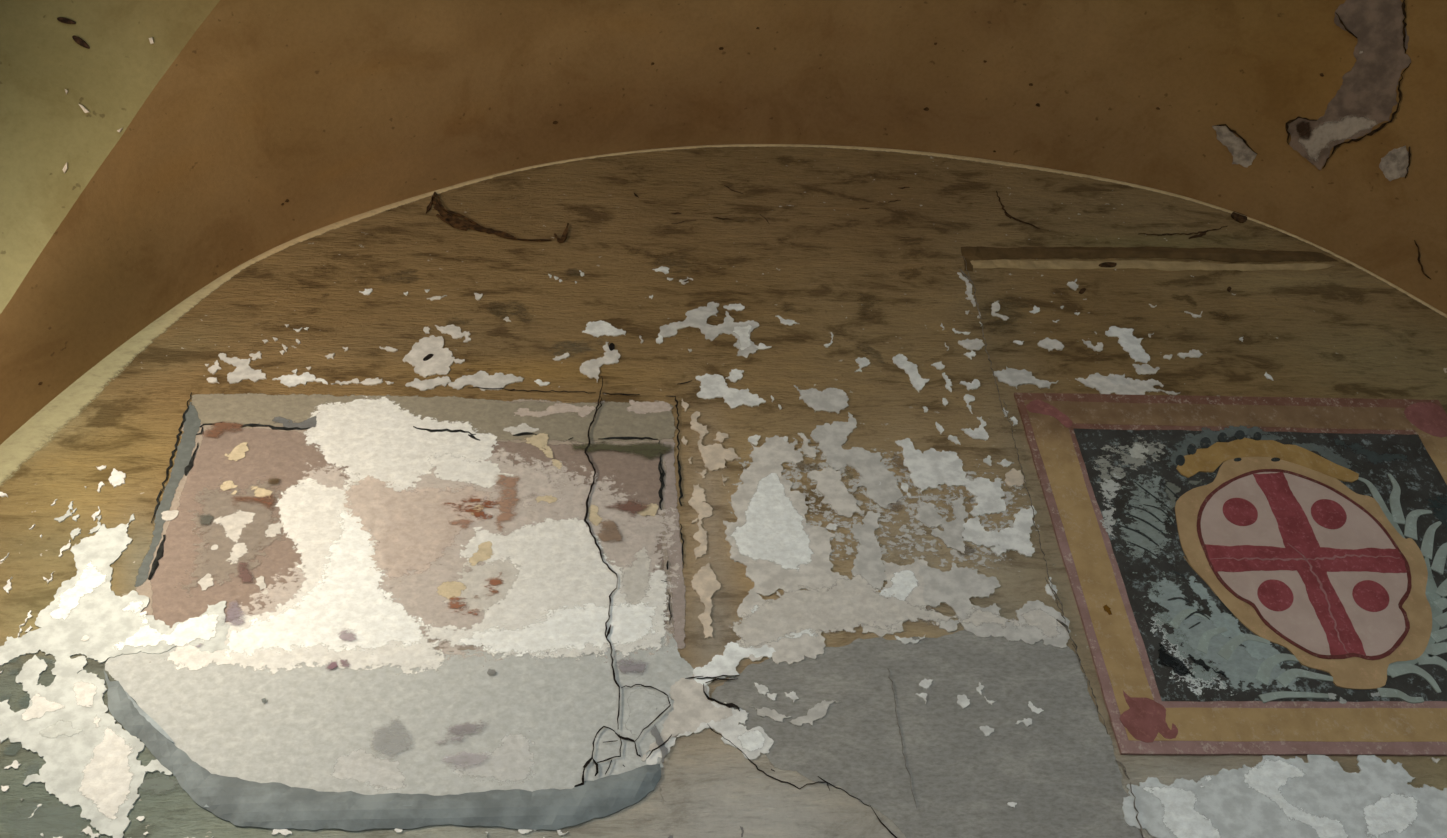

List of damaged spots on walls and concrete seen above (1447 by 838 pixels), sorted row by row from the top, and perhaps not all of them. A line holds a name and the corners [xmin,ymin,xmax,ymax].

flaking render [1285,0,1411,170]
flaking render [1212,124,1258,167]
flaking render [1379,146,1411,181]
peeling [653,266,693,285]
peeling [0,272,1203,838]
crack [468,376,897,838]
peeling [1122,755,1447,838]